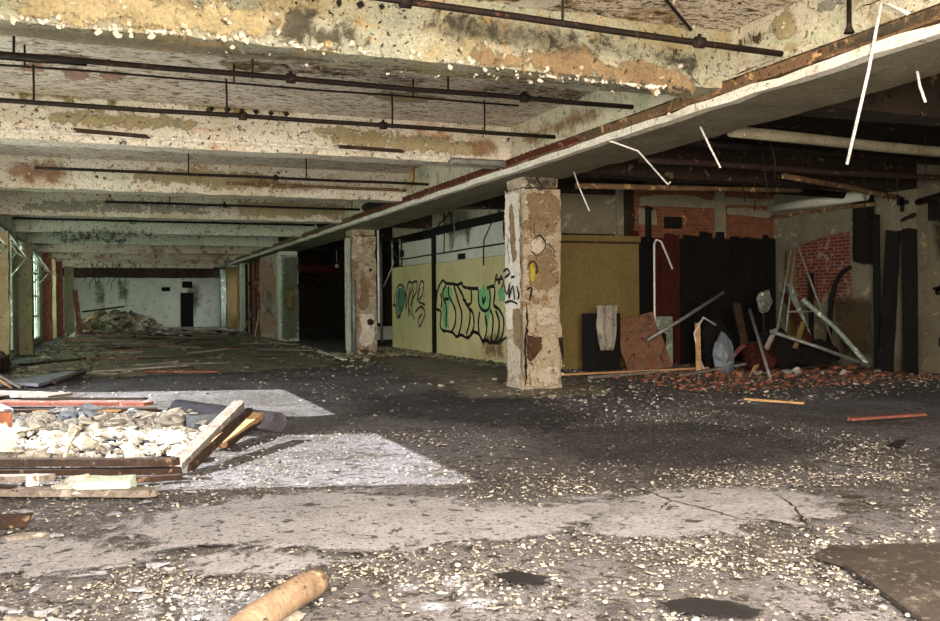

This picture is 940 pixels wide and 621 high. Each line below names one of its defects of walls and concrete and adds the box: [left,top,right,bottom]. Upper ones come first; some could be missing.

leakage [271,5,358,56]
peeling [0,0,696,105]
rust [829,8,940,49]
peeling [22,165,345,221]
flaking render [525,192,561,236]
flaking render [509,204,559,291]
spalling [504,301,542,374]